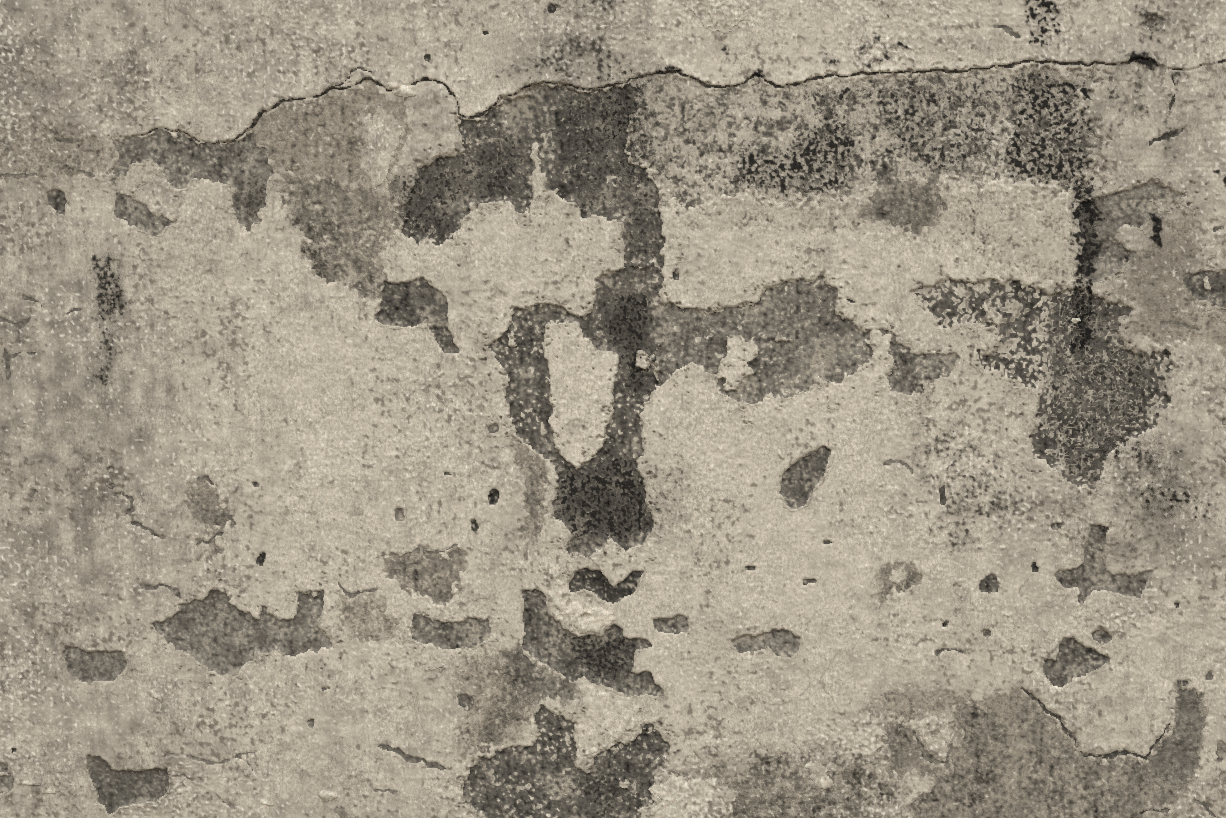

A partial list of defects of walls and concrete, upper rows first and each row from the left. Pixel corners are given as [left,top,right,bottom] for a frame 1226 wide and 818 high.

crack [141,25,1226,146]
peeling [364,65,1199,604]
peeling [1175,256,1226,318]
peeling [59,644,130,683]
peeling [83,754,171,818]
peeling [129,570,334,687]
peeling [398,607,500,654]
peeling [454,704,677,818]
peeling [517,589,691,701]
crack [1021,688,1170,761]
peeling [1021,626,1188,756]